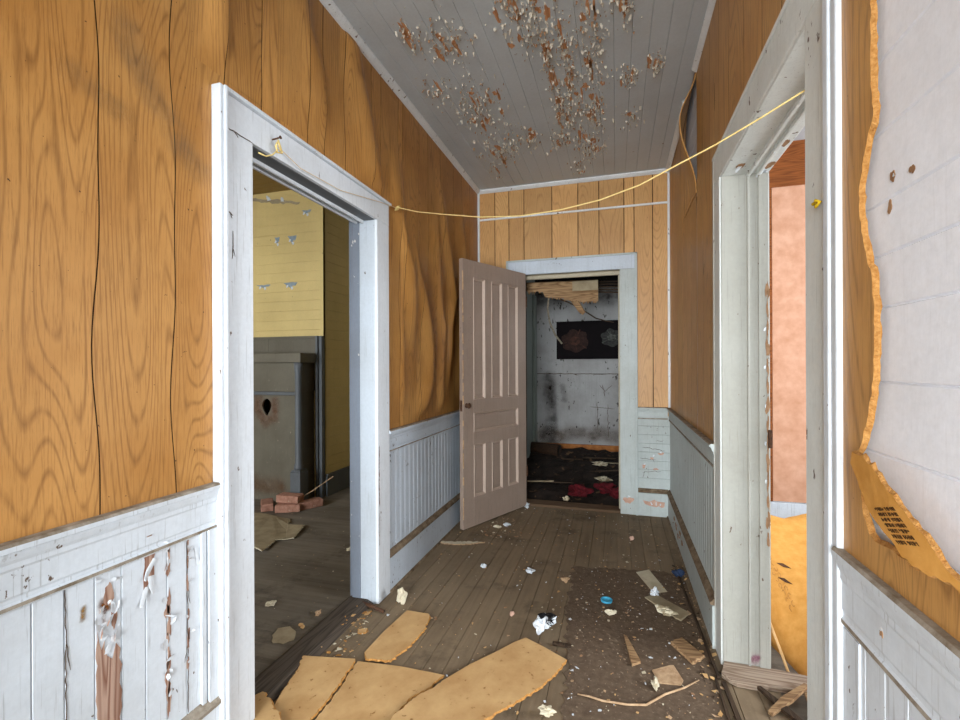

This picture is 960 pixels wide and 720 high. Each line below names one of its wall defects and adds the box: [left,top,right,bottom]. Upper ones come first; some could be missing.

peeling [393,0,666,187]
leakage [540,375,563,441]
peeling [95,576,122,720]
peeling [140,541,196,717]
peeling [186,540,200,592]